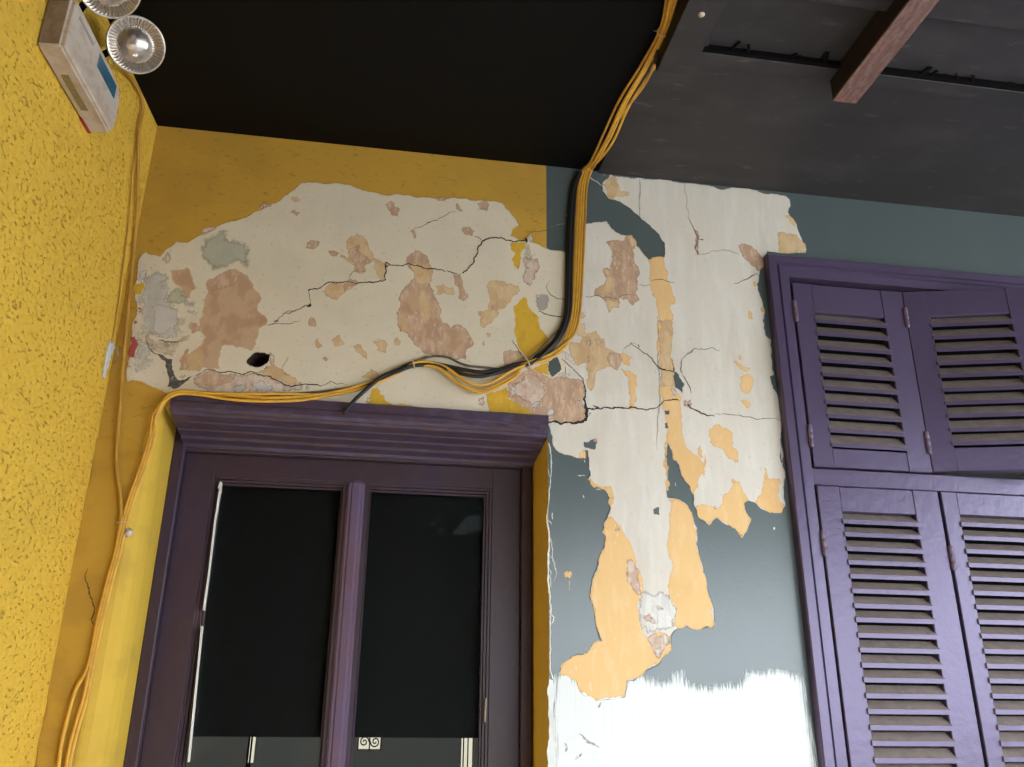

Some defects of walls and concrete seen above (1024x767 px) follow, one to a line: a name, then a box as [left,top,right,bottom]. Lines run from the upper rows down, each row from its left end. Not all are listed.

crack [267,230,546,326]
crack [540,279,674,317]
crack [690,221,738,255]
crack [145,337,347,389]
crack [549,342,780,425]
peeling [125,175,806,701]